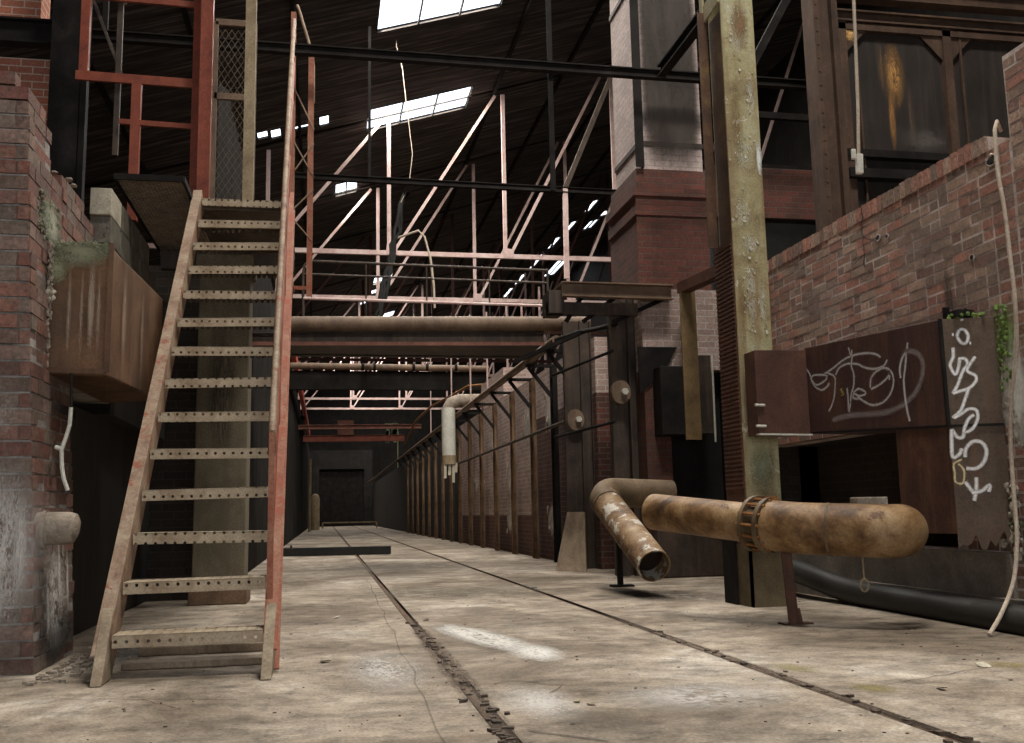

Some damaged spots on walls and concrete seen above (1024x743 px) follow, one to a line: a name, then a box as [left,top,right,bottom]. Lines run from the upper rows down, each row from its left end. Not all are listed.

peeling [728,132,762,175]
corrosion [67,275,100,336]
damp [0,494,32,610]
damp [41,554,73,660]